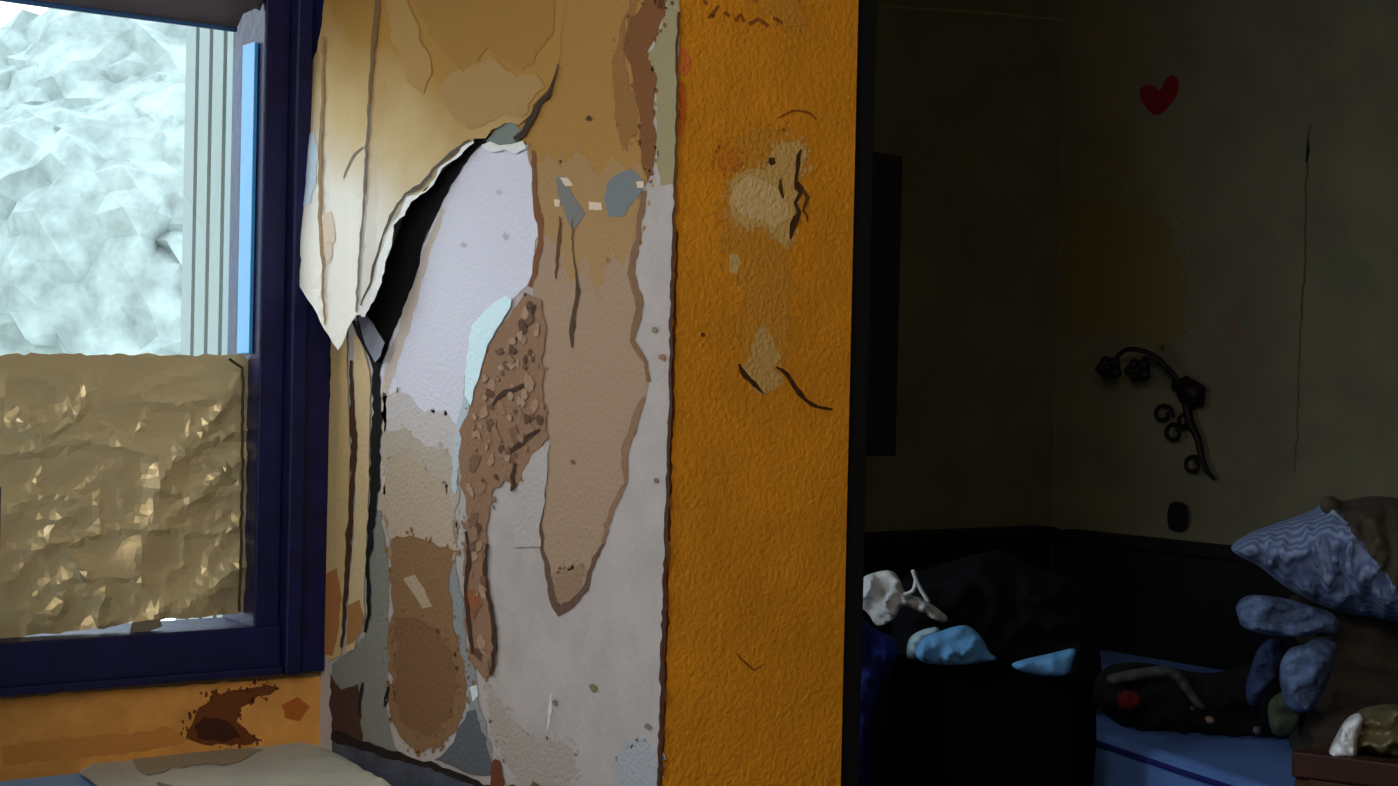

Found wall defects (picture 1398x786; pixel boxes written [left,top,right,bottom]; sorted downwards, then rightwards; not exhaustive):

spalling [554,169,644,230]
crack [778,109,817,239]
flaking render [326,123,550,786]
spalling [657,12,680,786]
crack [738,364,833,410]
corrosion [180,678,310,749]